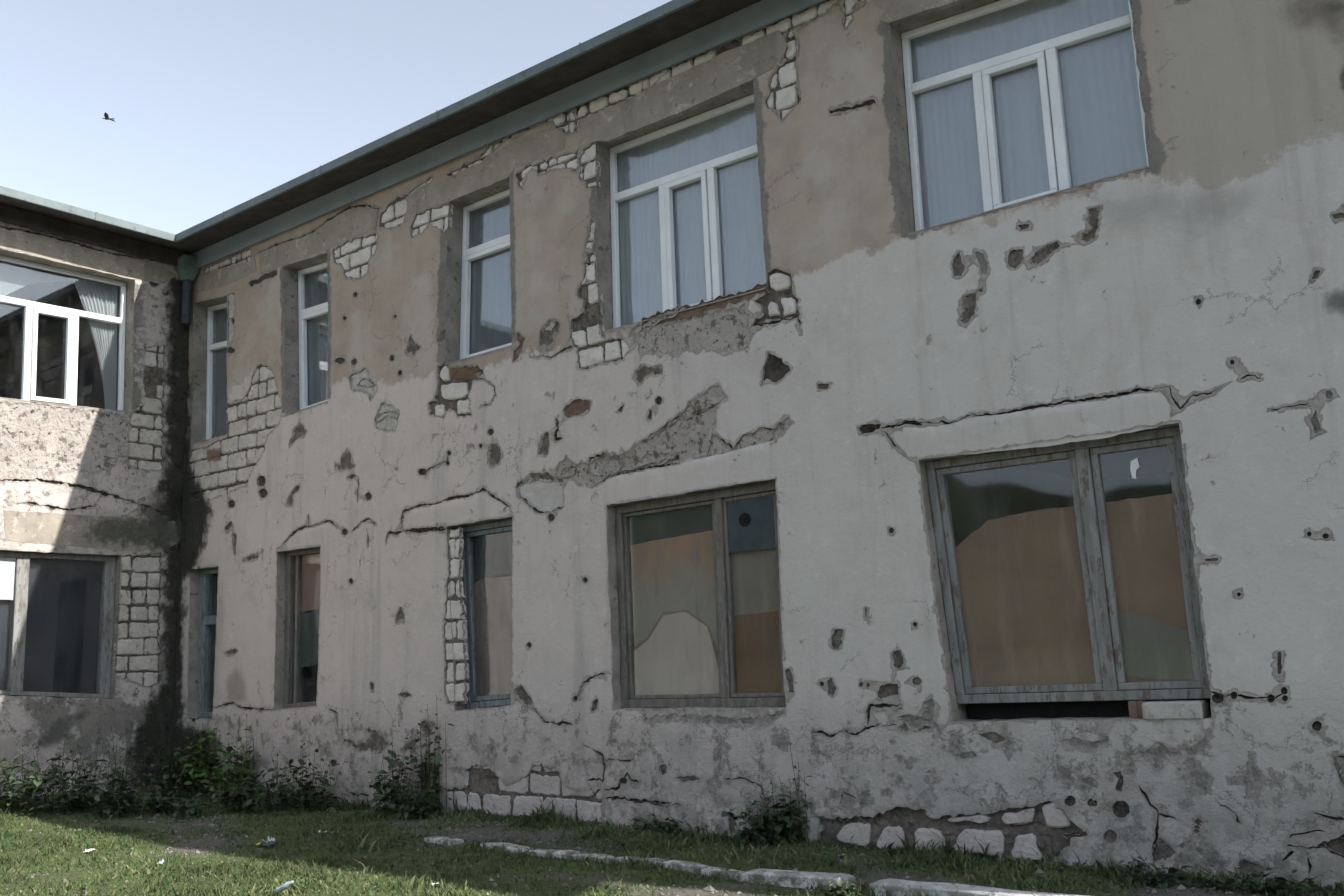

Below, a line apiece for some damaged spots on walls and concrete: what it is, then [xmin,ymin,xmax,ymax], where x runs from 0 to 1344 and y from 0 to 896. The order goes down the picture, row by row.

flaking render [332,0,864,297]
peeling [513,219,800,385]
crack [0,478,171,517]
water stain [92,515,181,548]
flaking render [188,363,281,562]
crack [282,453,510,546]
flaking render [428,361,483,418]
spalling [516,384,792,521]
crack [858,374,1261,457]
flaking render [443,527,469,705]
flaking render [445,764,603,824]
flaking render [816,771,1130,863]